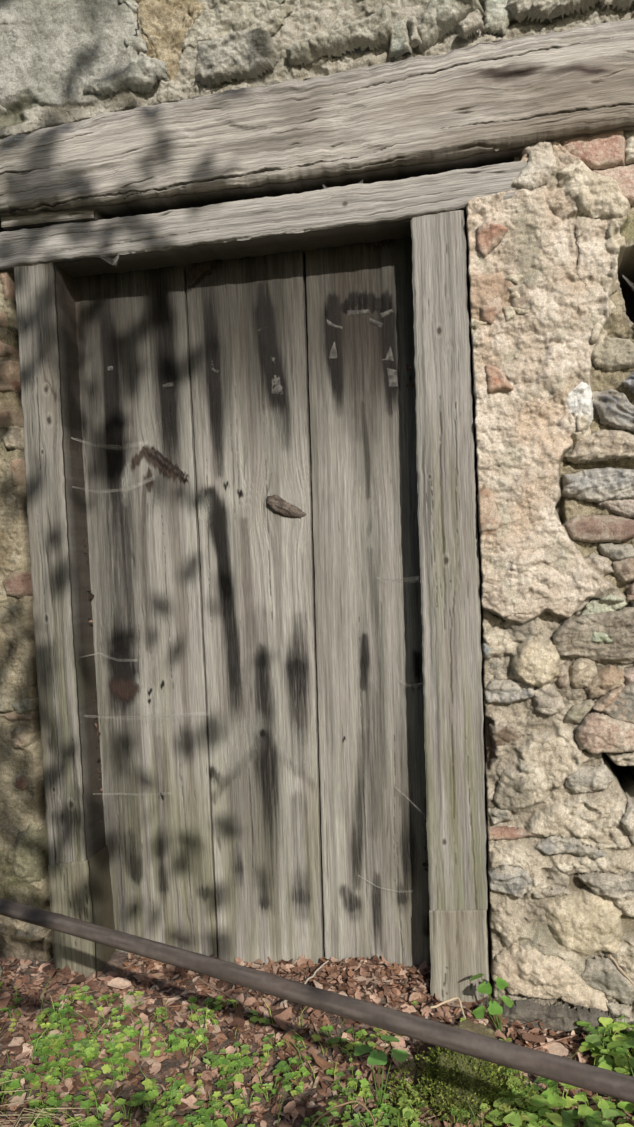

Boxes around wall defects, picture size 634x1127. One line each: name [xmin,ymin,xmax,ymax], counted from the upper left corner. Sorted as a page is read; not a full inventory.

spalling [118,0,205,79]